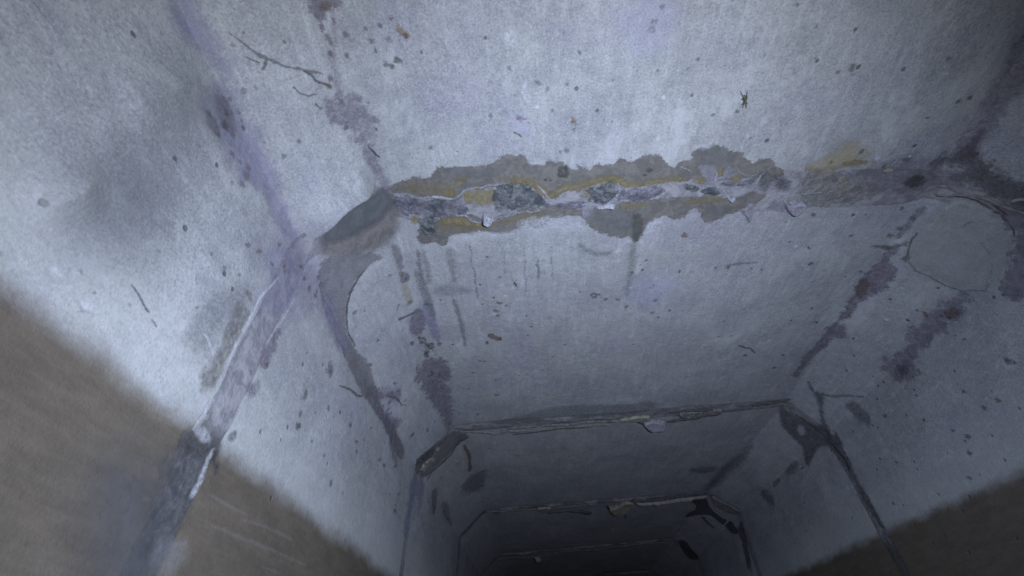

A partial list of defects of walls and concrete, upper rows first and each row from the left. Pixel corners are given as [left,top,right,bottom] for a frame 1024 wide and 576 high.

peeling [404,184,501,200]
peeling [456,186,560,227]
peeling [573,183,620,218]
peeling [681,165,761,222]